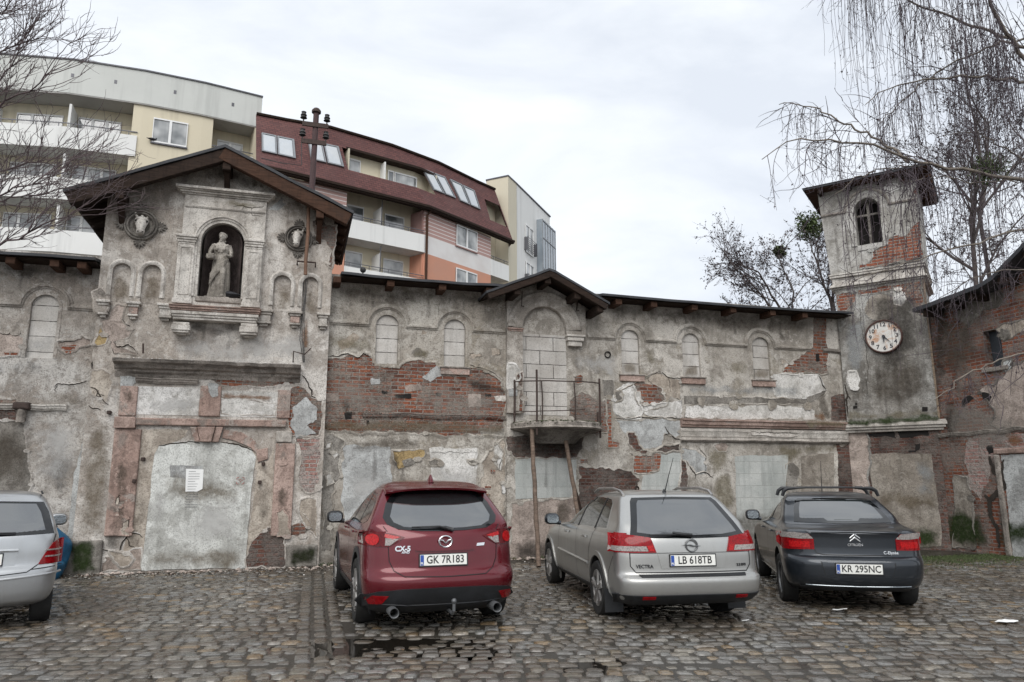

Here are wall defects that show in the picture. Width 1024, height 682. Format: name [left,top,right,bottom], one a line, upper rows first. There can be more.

flaking render [858,222,926,270]
crack [54,362,108,410]
spalling [962,360,1024,430]
flaking render [208,318,847,570]